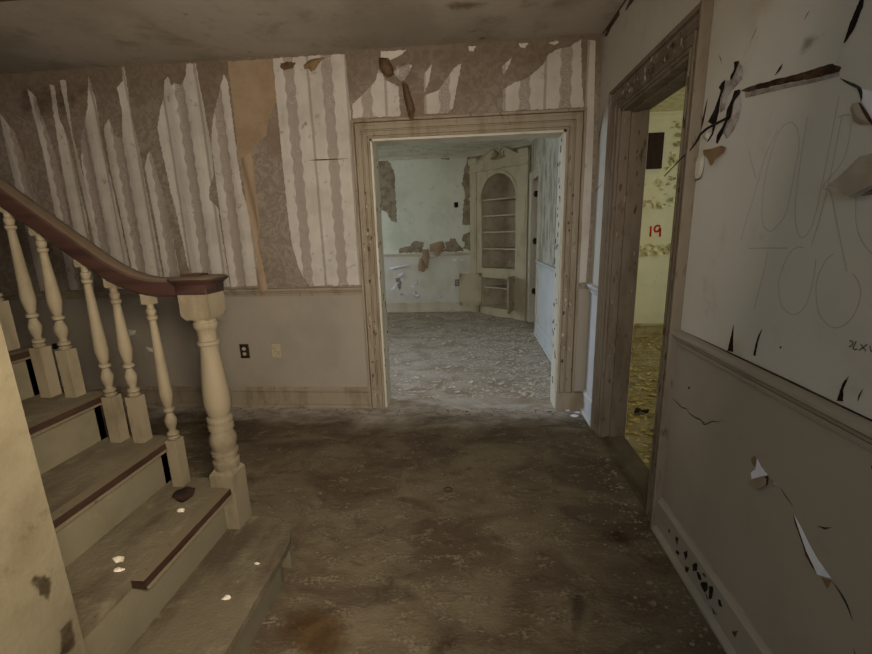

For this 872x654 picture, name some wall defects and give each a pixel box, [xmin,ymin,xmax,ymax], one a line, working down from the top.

flaking render [603,0,634,37]
spalling [695,61,743,181]
flaking render [862,89,872,119]
peeling [363,229,421,396]
crack [673,399,720,425]
crack [682,330,872,422]
flaking render [751,459,767,479]
spalling [668,529,722,615]